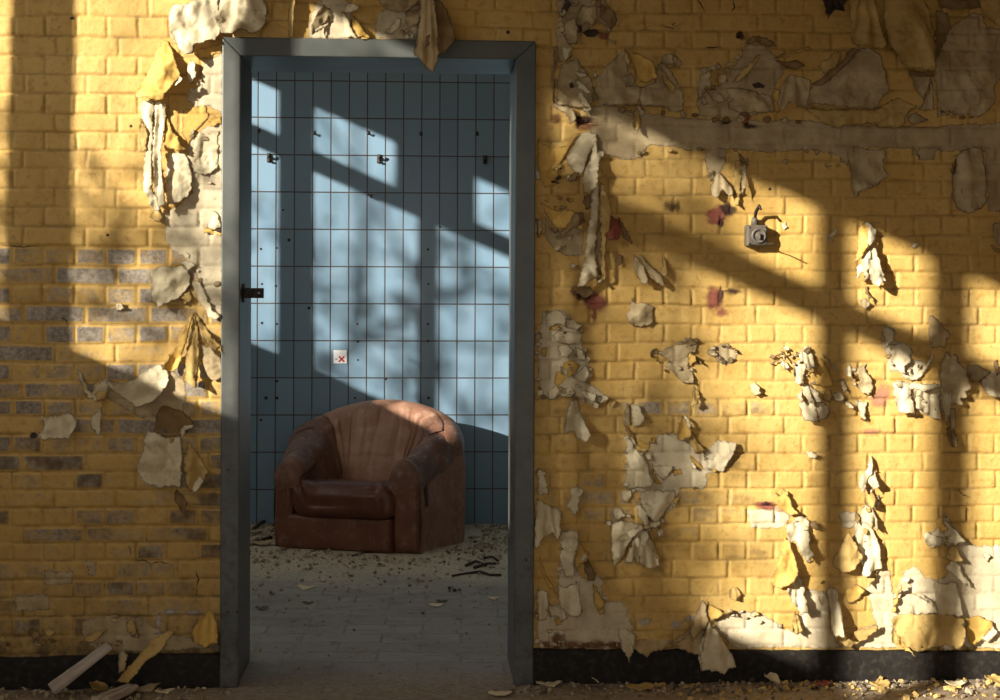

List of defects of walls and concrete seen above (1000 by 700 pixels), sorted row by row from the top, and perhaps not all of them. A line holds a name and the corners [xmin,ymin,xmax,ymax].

peeling [288,0,296,38]
peeling [308,0,456,72]
peeling [535,0,1000,309]
peeling [77,0,268,513]
peeling [626,298,654,327]
peeling [29,413,78,441]
peeling [535,309,740,569]
peeling [769,346,874,422]
peeling [881,315,1000,448]
peeling [534,456,1000,675]